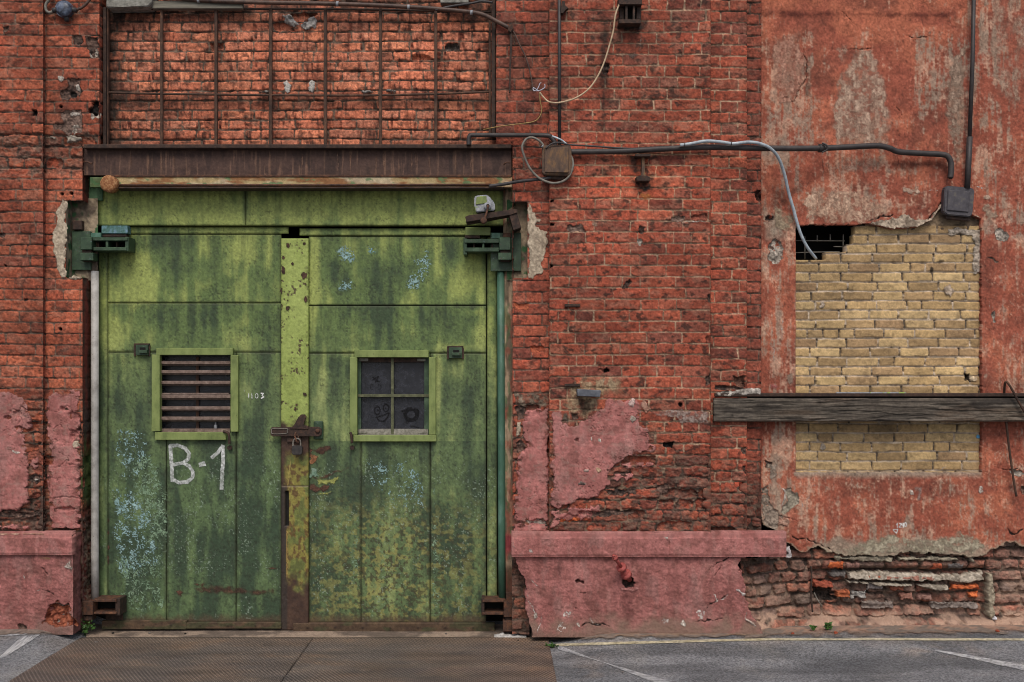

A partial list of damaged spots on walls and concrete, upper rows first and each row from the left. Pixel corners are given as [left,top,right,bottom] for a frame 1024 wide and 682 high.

spalling [53,76,101,136]
spalling [52,199,81,280]
spalling [527,204,554,279]
peeling [0,389,83,535]
peeling [513,398,673,531]
spalling [761,460,803,529]
spalling [812,534,984,610]
spalling [42,600,79,627]